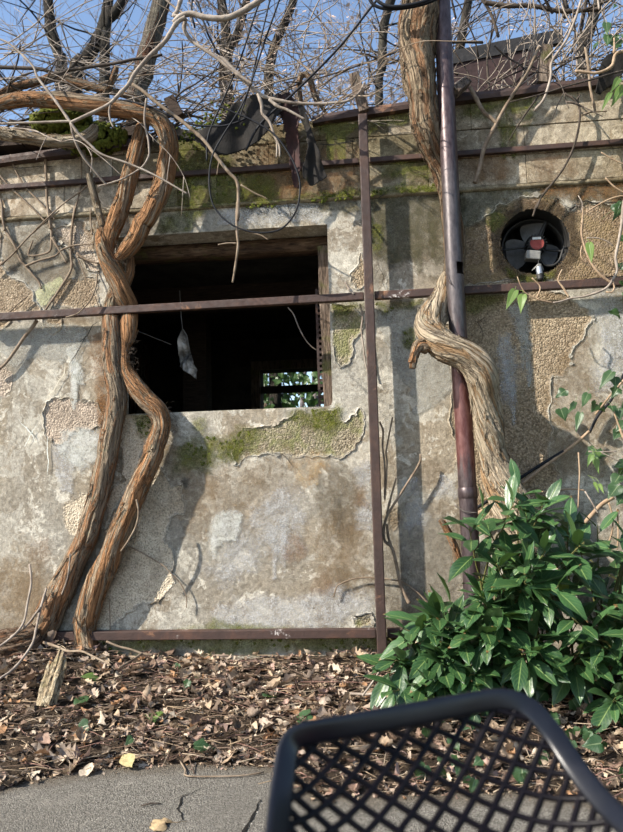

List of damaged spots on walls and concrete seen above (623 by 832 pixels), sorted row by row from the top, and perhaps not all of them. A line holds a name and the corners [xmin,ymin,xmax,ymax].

peeling [464,192,623,520]
peeling [41,396,104,446]
peeling [62,492,88,536]
peeling [101,415,152,532]
peeling [96,465,187,630]